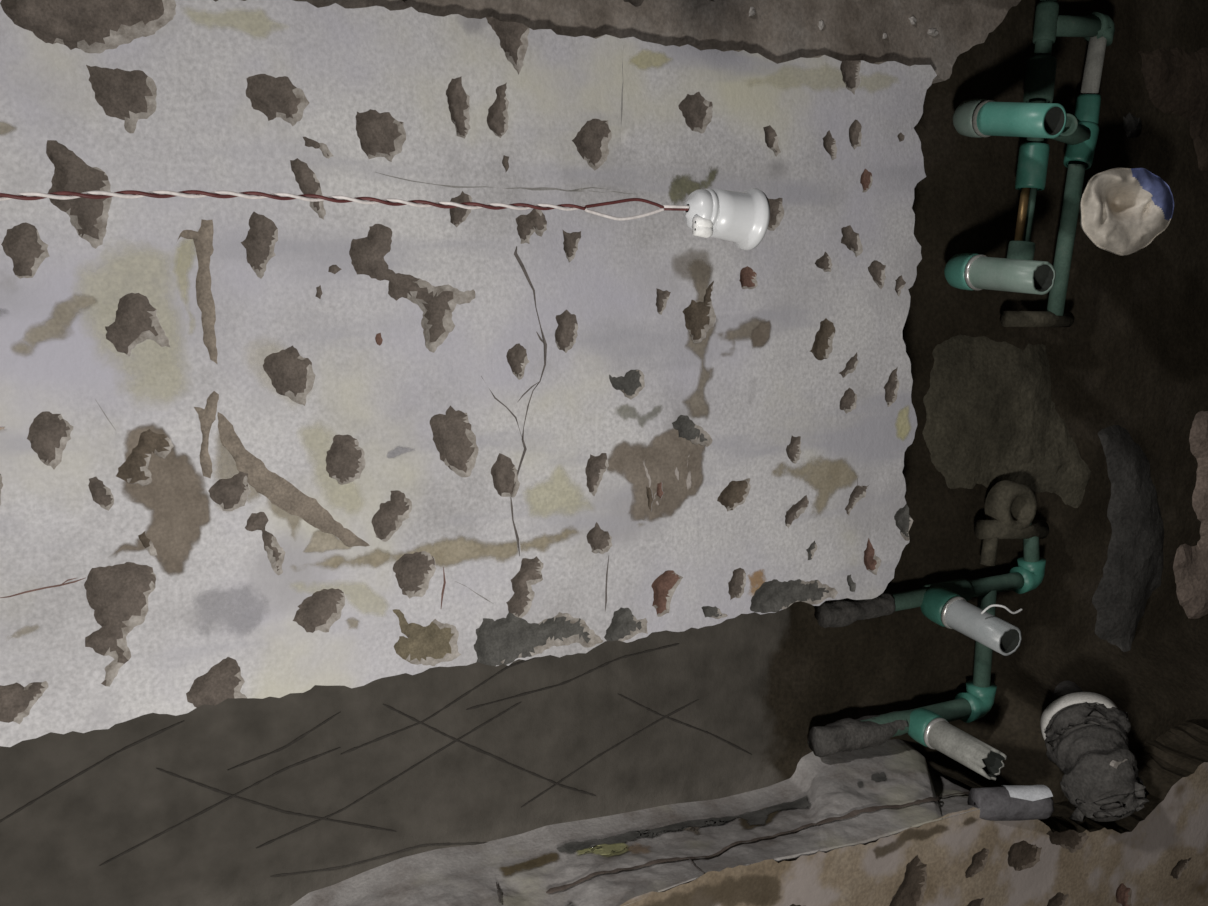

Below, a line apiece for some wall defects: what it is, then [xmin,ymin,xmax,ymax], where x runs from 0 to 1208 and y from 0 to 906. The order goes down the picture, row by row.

flaking render [0,0,176,133]
spalling [46,140,112,249]
flaking render [328,224,475,353]
crack [481,246,547,556]
peeling [585,415,713,521]
peeling [84,425,286,687]
flaking render [393,551,683,666]
flaking render [702,568,856,619]
spalling [806,541,817,560]
spalling [864,538,881,575]
spalling [0,681,48,724]